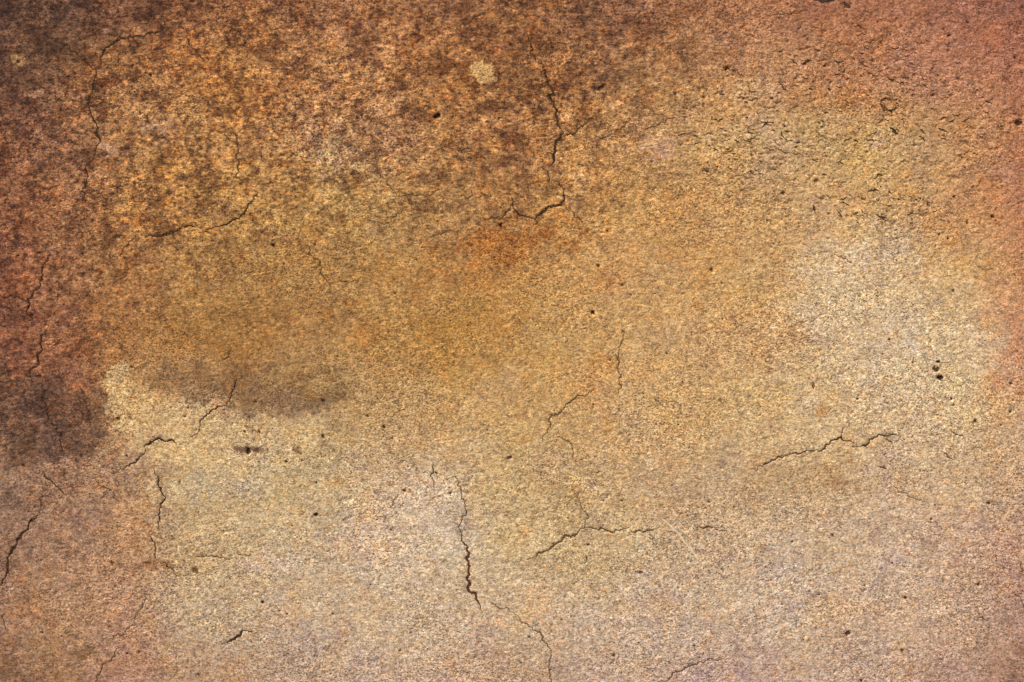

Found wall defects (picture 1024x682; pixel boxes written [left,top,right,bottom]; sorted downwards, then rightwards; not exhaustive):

crack [64,20,204,199]
crack [379,33,696,225]
crack [0,473,65,586]
damp [0,354,125,484]
crack [95,348,237,571]
damp [131,353,370,423]
crack [430,462,552,682]
crack [527,493,653,564]
crack [757,428,922,500]